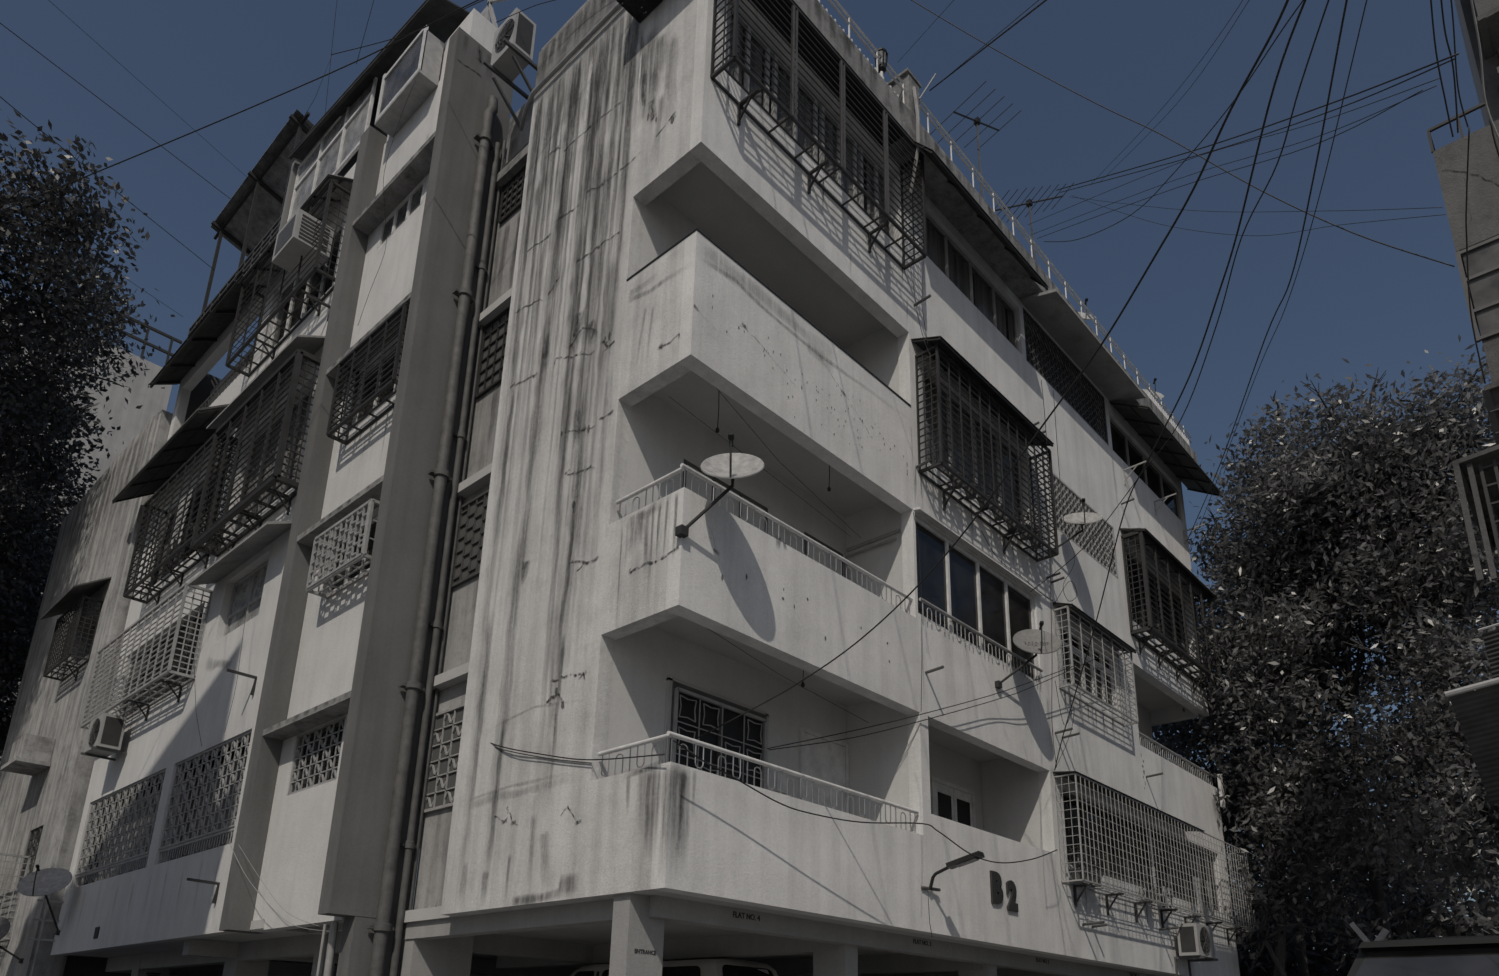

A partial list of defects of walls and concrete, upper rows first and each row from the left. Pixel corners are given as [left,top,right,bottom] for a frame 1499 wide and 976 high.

water stain [554,28,653,137]